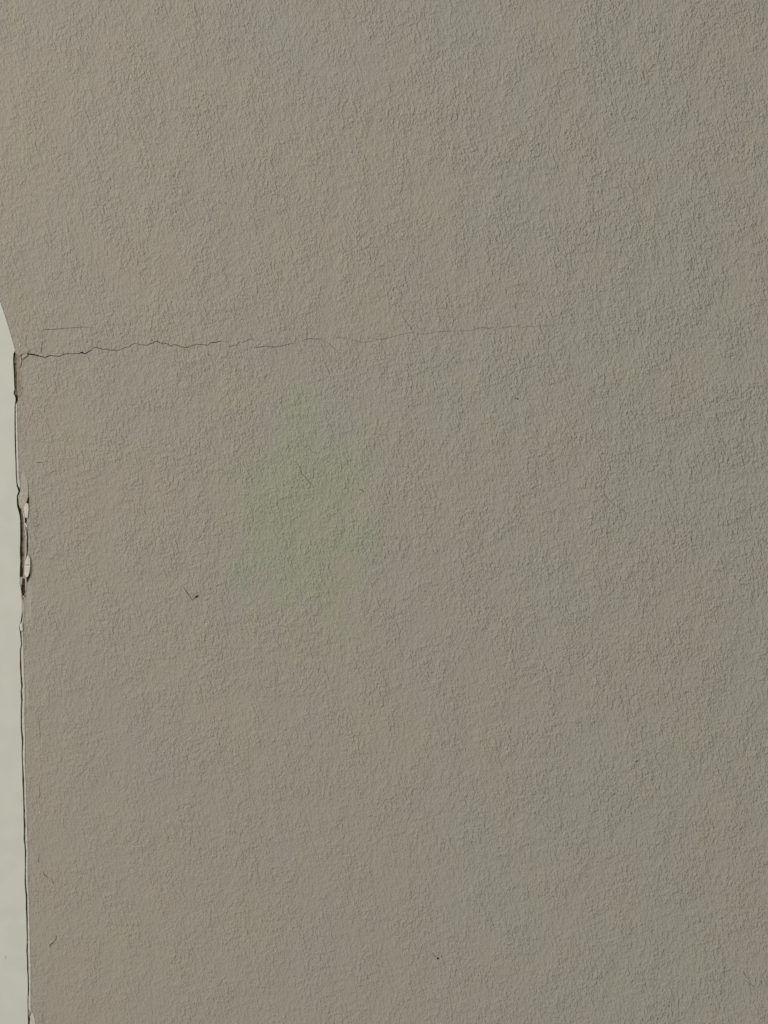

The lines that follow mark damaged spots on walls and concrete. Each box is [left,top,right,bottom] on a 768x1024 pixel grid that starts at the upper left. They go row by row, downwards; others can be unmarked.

peeling [18,471,30,599]
crack [14,318,553,850]
crack [24,891,32,1024]